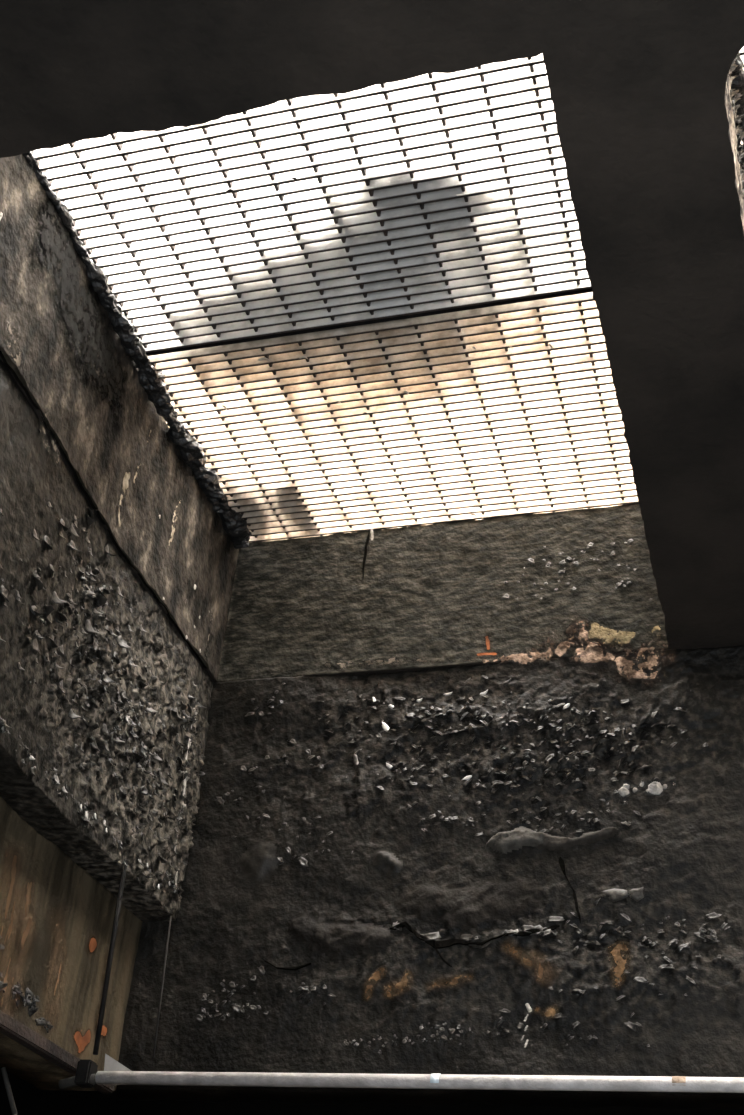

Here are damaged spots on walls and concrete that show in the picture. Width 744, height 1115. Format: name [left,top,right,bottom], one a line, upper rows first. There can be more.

spalling [728,58,744,199]
peeling [245,683,286,732]
peeling [310,620,708,854]
peeling [241,739,324,793]
peeling [246,813,333,867]